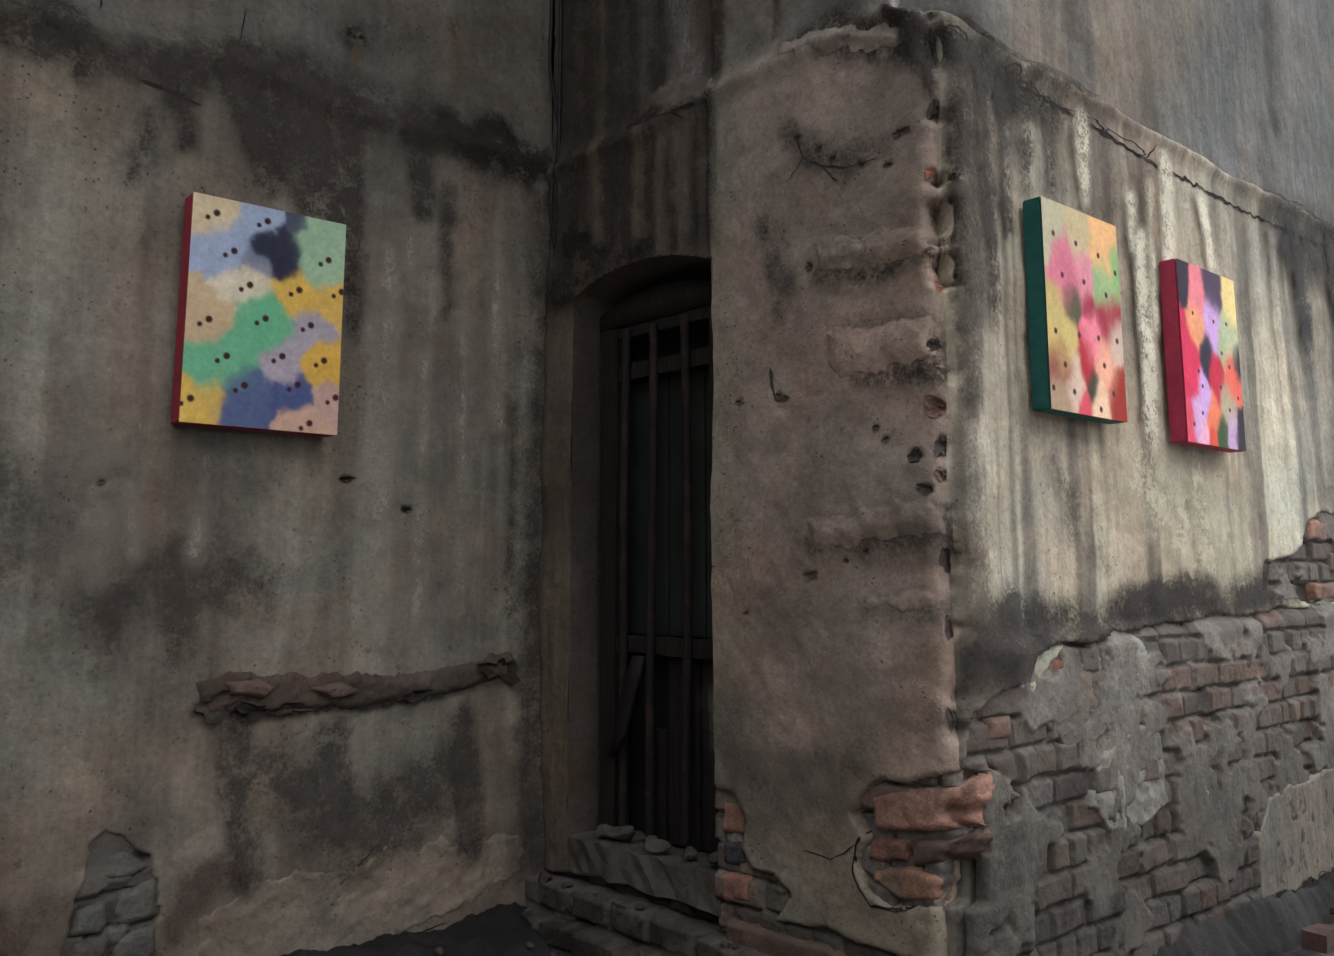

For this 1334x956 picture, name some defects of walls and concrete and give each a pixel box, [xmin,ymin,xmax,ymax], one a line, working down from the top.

crack [789,141,874,182]
spalling [927,100,940,120]
damp [934,19,1092,408]
crack [948,25,1327,250]
damp [1250,195,1334,368]
damp [116,0,720,869]
spalling [916,435,947,495]
damp [959,144,1306,690]
damp [80,482,268,660]
flaking render [861,512,1334,956]
flaking render [60,830,160,956]
flaking render [557,787,898,956]